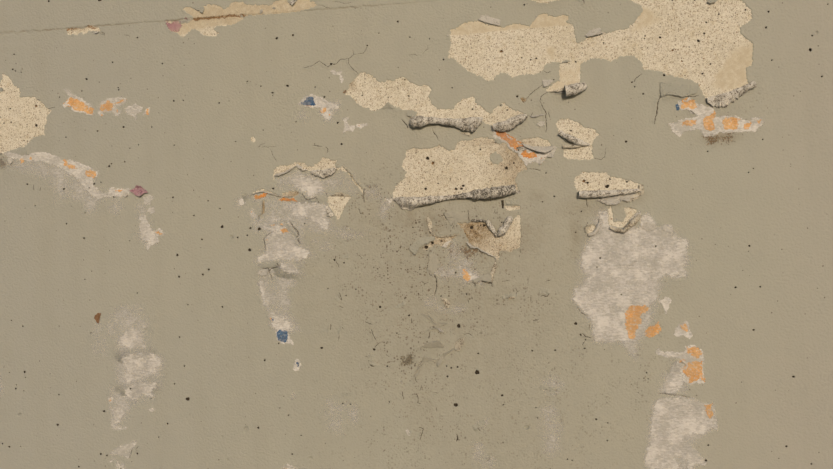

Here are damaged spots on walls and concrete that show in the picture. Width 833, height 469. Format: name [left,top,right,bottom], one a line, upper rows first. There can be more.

peeling [166,0,316,37]
peeling [447,0,757,108]
peeling [0,74,52,164]
peeling [556,118,599,160]
peeling [273,157,363,193]
peeling [326,192,351,219]
peeling [345,72,545,282]
peeling [574,172,644,236]